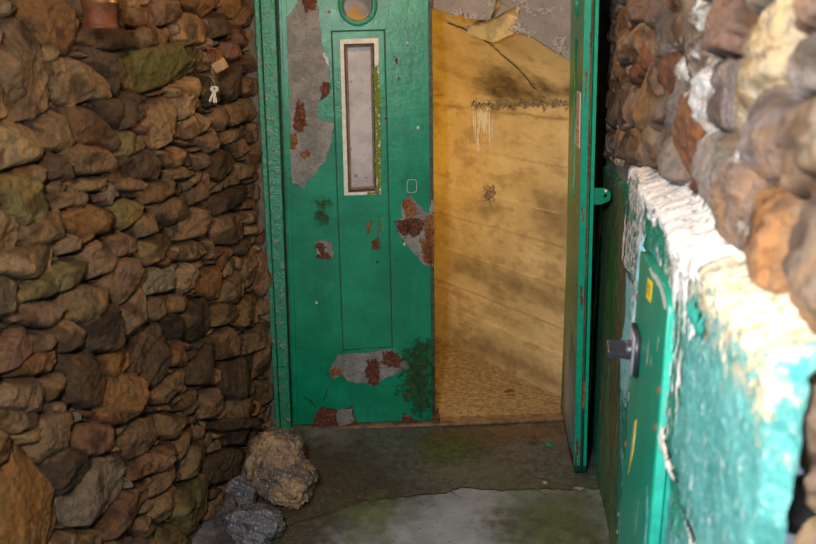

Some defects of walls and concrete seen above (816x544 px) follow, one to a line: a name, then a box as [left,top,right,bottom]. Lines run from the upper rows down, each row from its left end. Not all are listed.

crack [444,21,540,93]
spalling [448,0,564,42]
peeling [287,0,334,189]
leakage [467,95,498,154]
peeling [394,196,435,267]
leakage [622,176,645,318]
peeling [328,349,409,386]
leakage [656,243,816,420]
leakage [489,488,605,544]
crack [658,424,695,544]